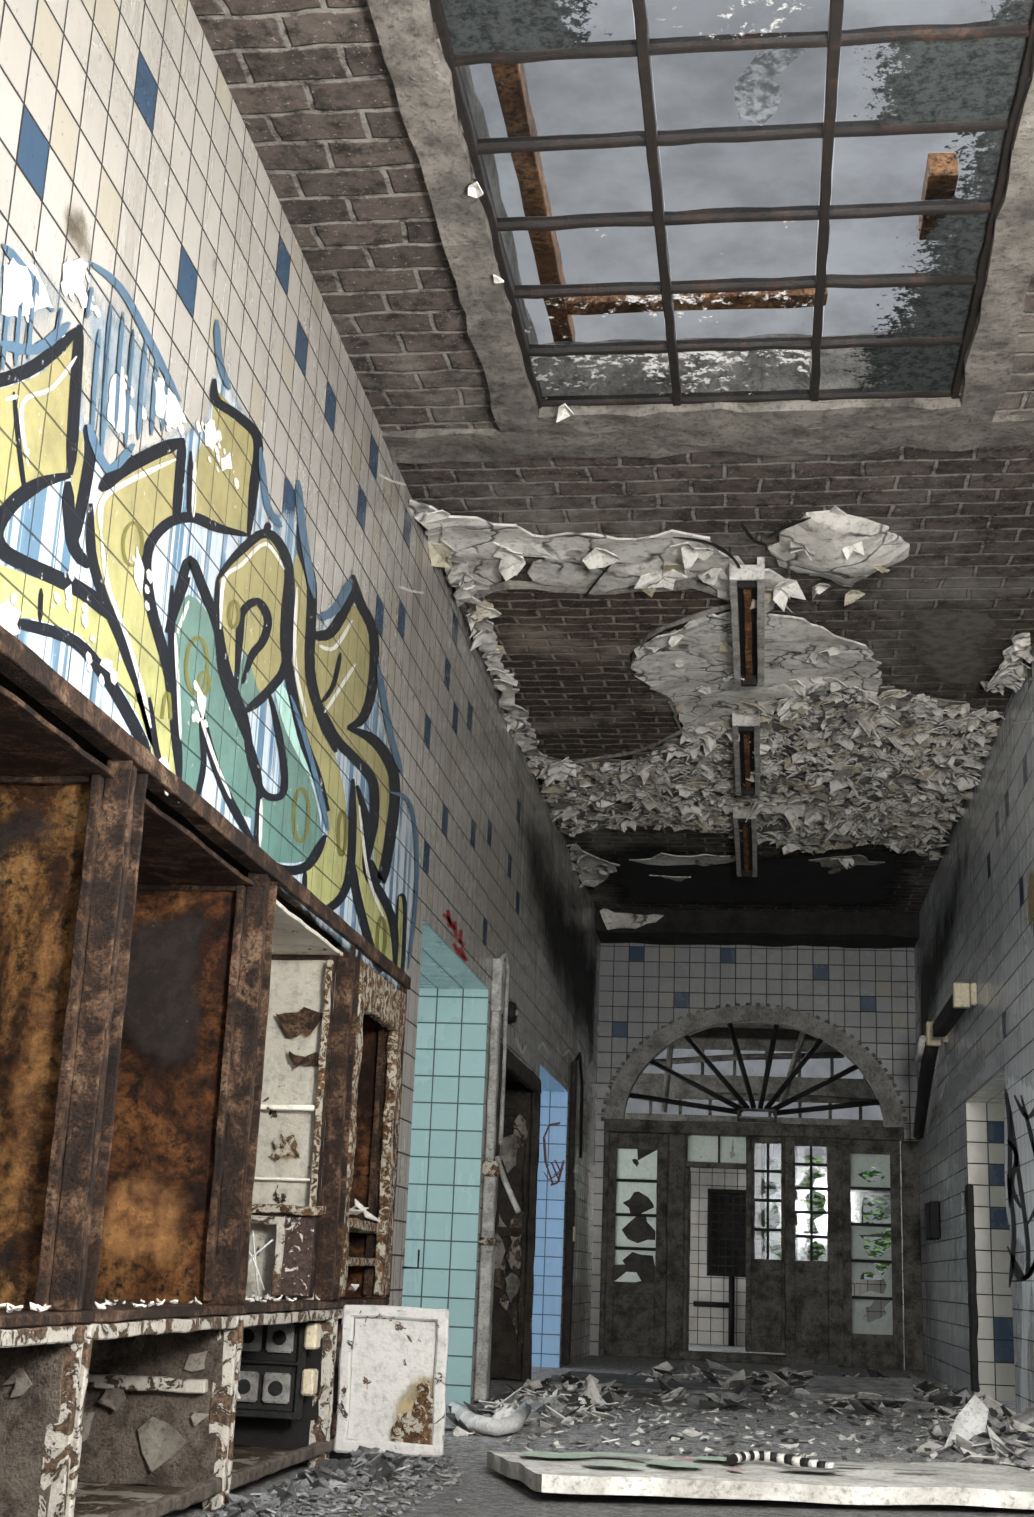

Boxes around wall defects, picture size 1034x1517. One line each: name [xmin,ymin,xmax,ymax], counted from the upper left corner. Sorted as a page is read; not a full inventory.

flaking render [408,499,1034,889]
rust [0,811,49,856]
rust [122,912,205,1066]
rust [104,1185,174,1258]
peeling [349,1199,380,1222]
peeling [2,1368,32,1397]
peeling [90,1335,149,1360]
peeling [184,1351,207,1372]
peeling [82,1389,126,1442]
peeling [138,1411,210,1472]
rust [391,1378,444,1445]